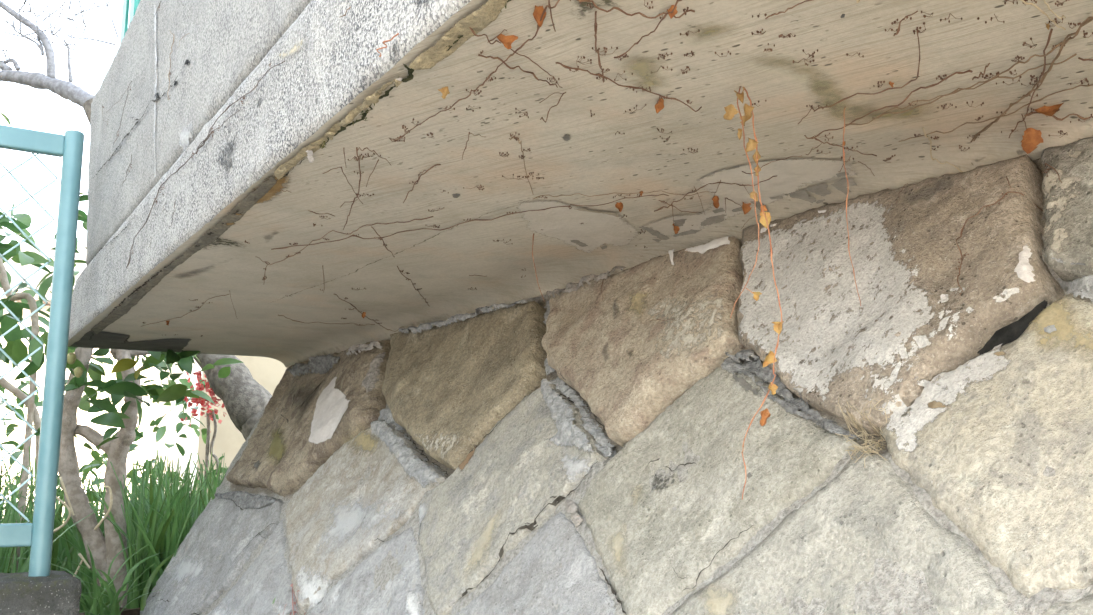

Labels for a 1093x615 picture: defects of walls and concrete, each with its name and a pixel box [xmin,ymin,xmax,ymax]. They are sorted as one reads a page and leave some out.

spalling [409,0,508,70]
spalling [91,77,403,334]
peeling [518,158,1047,452]
crack [457,461,598,601]
crack [673,525,754,590]